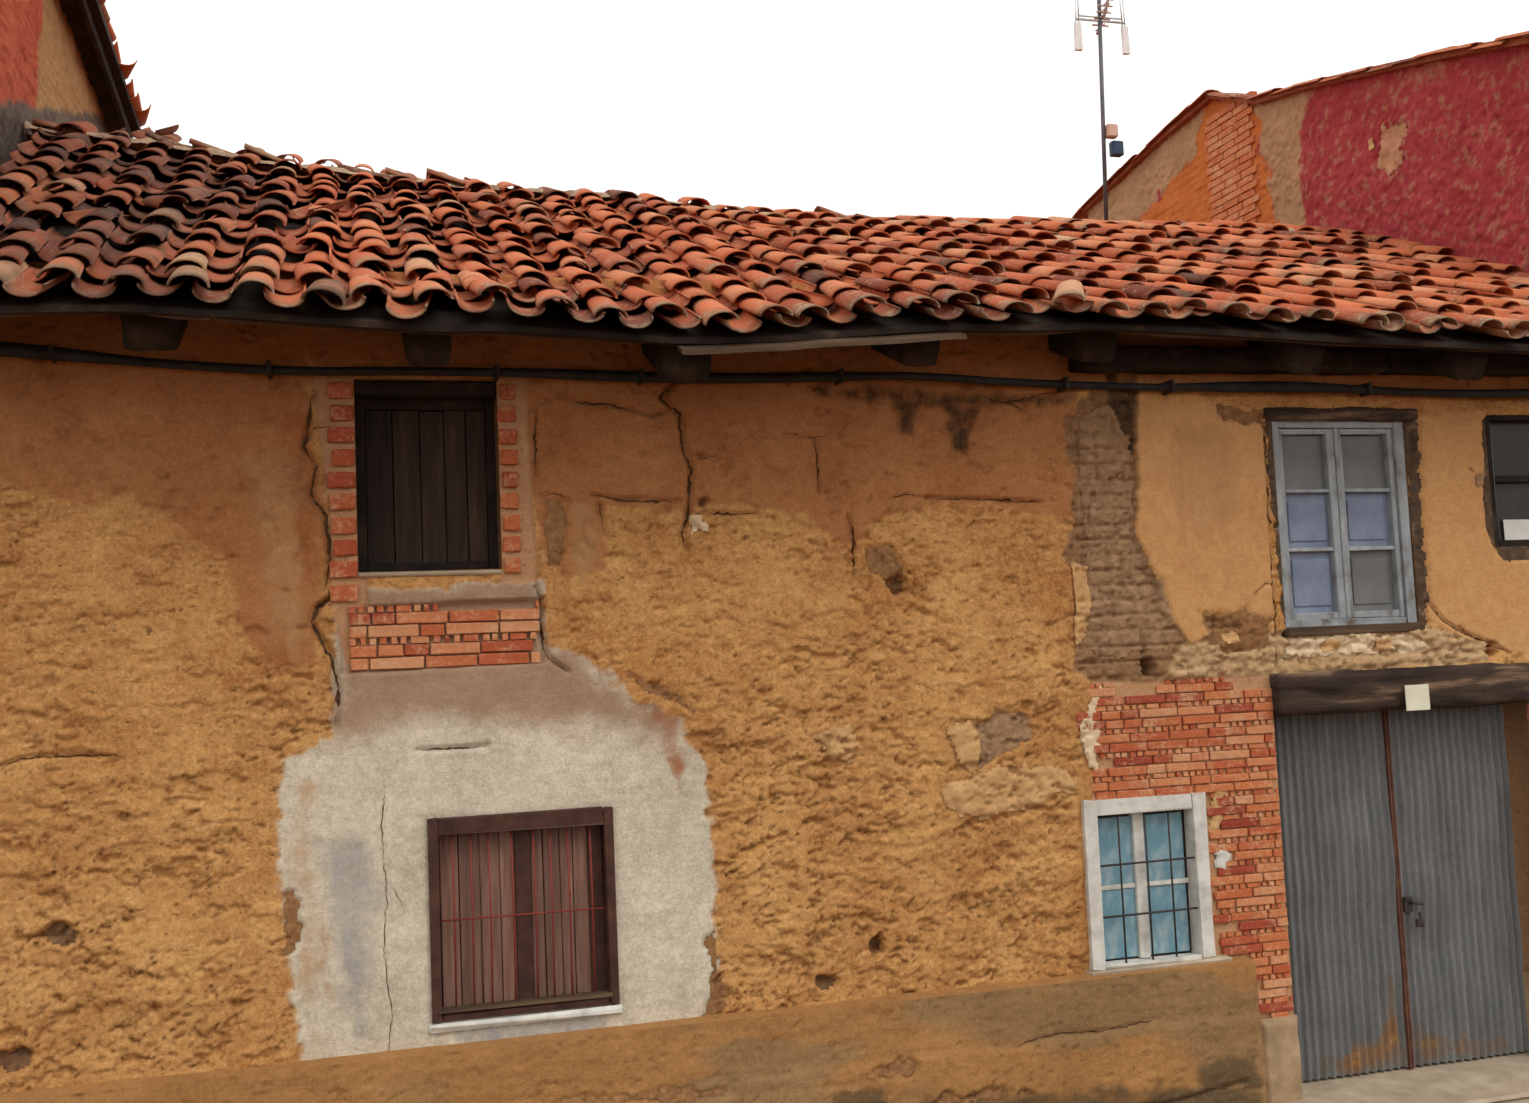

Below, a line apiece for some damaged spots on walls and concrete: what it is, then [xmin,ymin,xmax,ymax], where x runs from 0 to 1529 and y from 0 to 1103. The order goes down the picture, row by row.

spalling [1368,121,1408,177]
crack [302,395,341,722]
crack [533,385,756,548]
crack [786,433,824,486]
crack [847,517,856,574]
crack [891,494,1040,503]
spalling [1070,404,1182,660]
spalling [1203,404,1429,660]
flaking render [941,711,1079,821]
flaking render [1079,686,1102,778]
crack [380,777,403,1048]
spalling [703,931,729,1016]